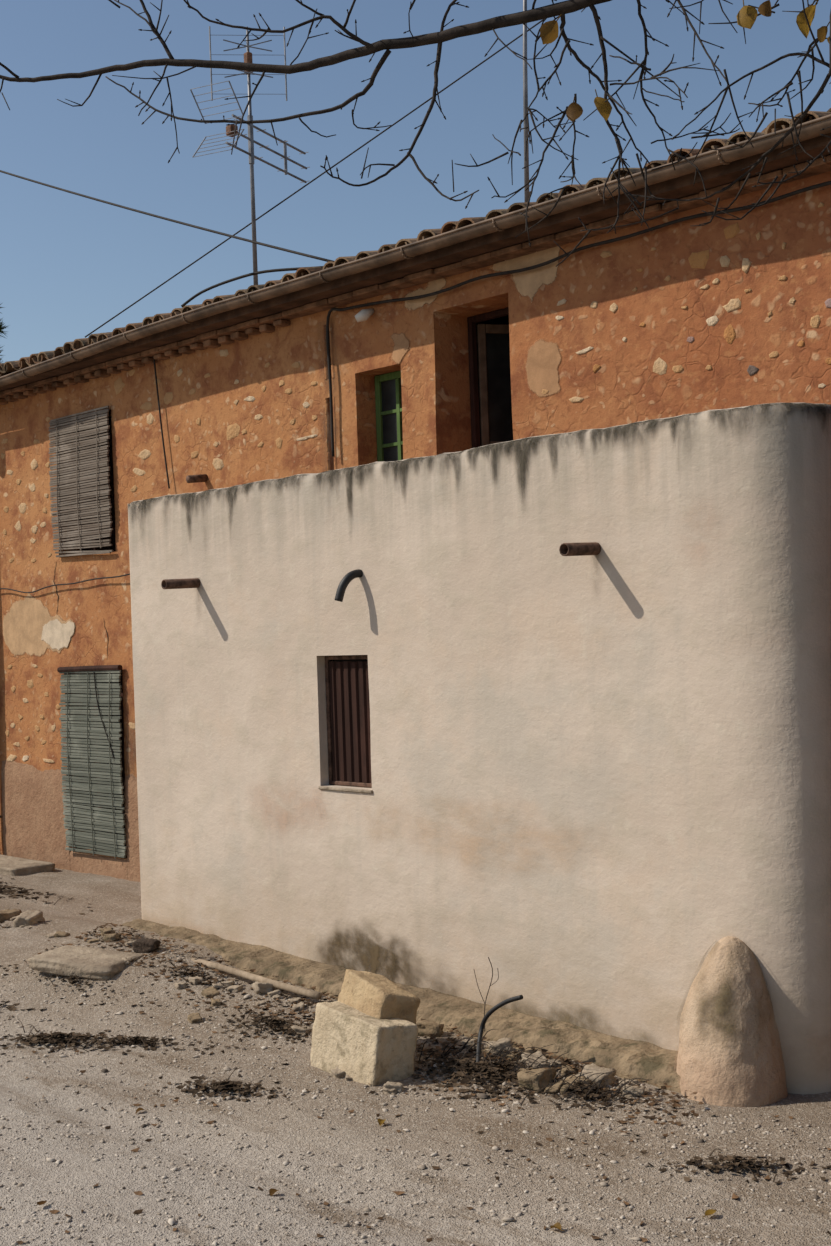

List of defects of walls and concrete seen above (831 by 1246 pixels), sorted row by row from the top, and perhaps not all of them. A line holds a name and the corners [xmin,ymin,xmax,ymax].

peeling [493,246,560,301]
spalling [688,250,751,289]
spalling [706,288,752,344]
peeling [525,339,601,403]
spalling [653,357,684,375]
water stain [714,403,830,423]
water stain [387,457,432,484]
water stain [448,414,690,494]
peeling [3,593,75,763]